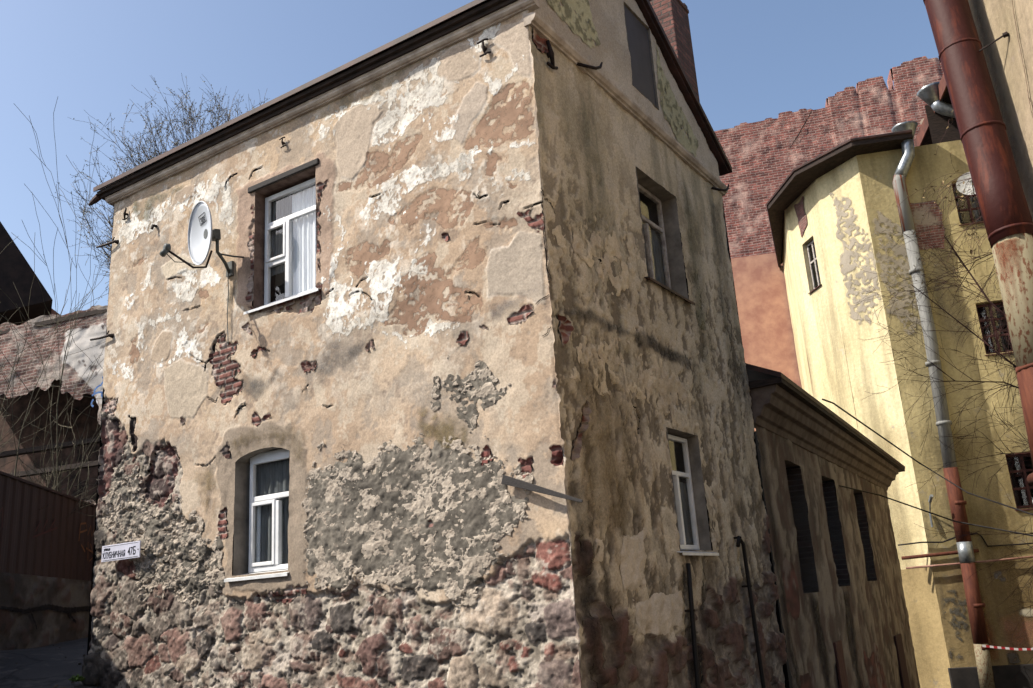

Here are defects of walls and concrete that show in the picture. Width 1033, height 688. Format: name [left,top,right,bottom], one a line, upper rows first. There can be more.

peeling [468,23,501,61]
spalling [532,29,548,53]
peeling [242,55,640,351]
peeling [829,193,945,335]
spalling [61,257,244,614]
spalling [256,360,533,612]